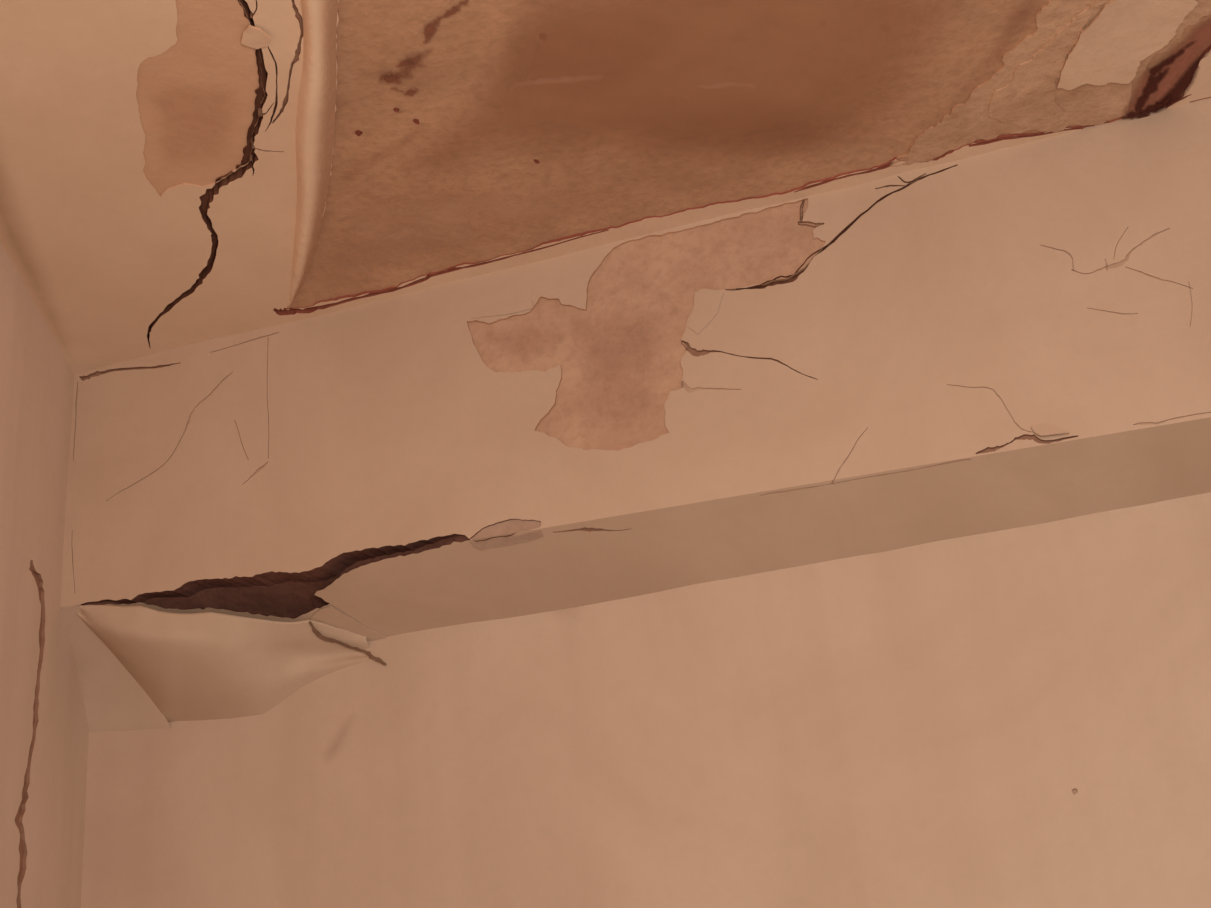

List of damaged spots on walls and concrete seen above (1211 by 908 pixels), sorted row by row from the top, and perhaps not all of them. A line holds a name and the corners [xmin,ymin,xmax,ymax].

peeling [136,0,271,197]
water stain [495,0,919,137]
crack [73,0,303,461]
flaking render [285,0,1211,451]
crack [1041,227,1193,325]
crack [681,340,818,393]
crack [760,384,1078,496]
spalling [81,519,543,665]